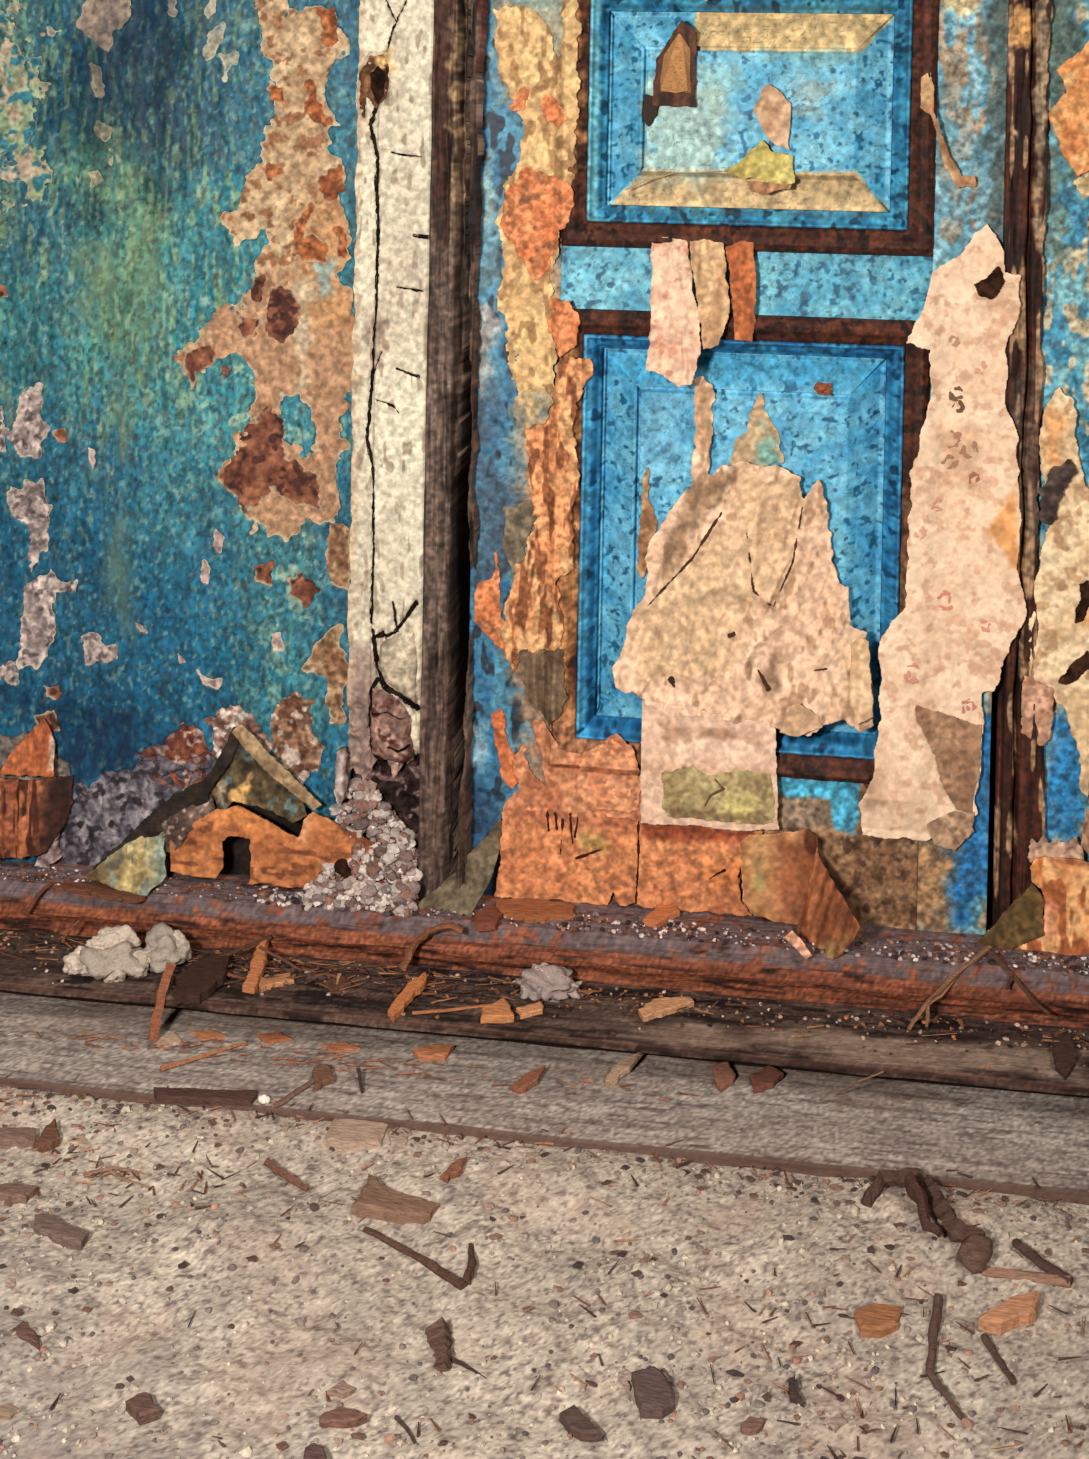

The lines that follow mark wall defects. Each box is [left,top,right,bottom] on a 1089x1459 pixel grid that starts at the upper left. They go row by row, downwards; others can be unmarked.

peeling [0,0,131,224]
peeling [1048,40,1089,196]
peeling [0,382,51,460]
peeling [173,0,355,590]
corrosion [235,274,302,343]
corrosion [220,407,322,514]
crack [365,106,429,762]
peeling [473,0,593,726]
peeling [0,478,78,686]
spalling [0,624,349,866]
spalling [219,836,251,876]
spalling [350,753,420,881]